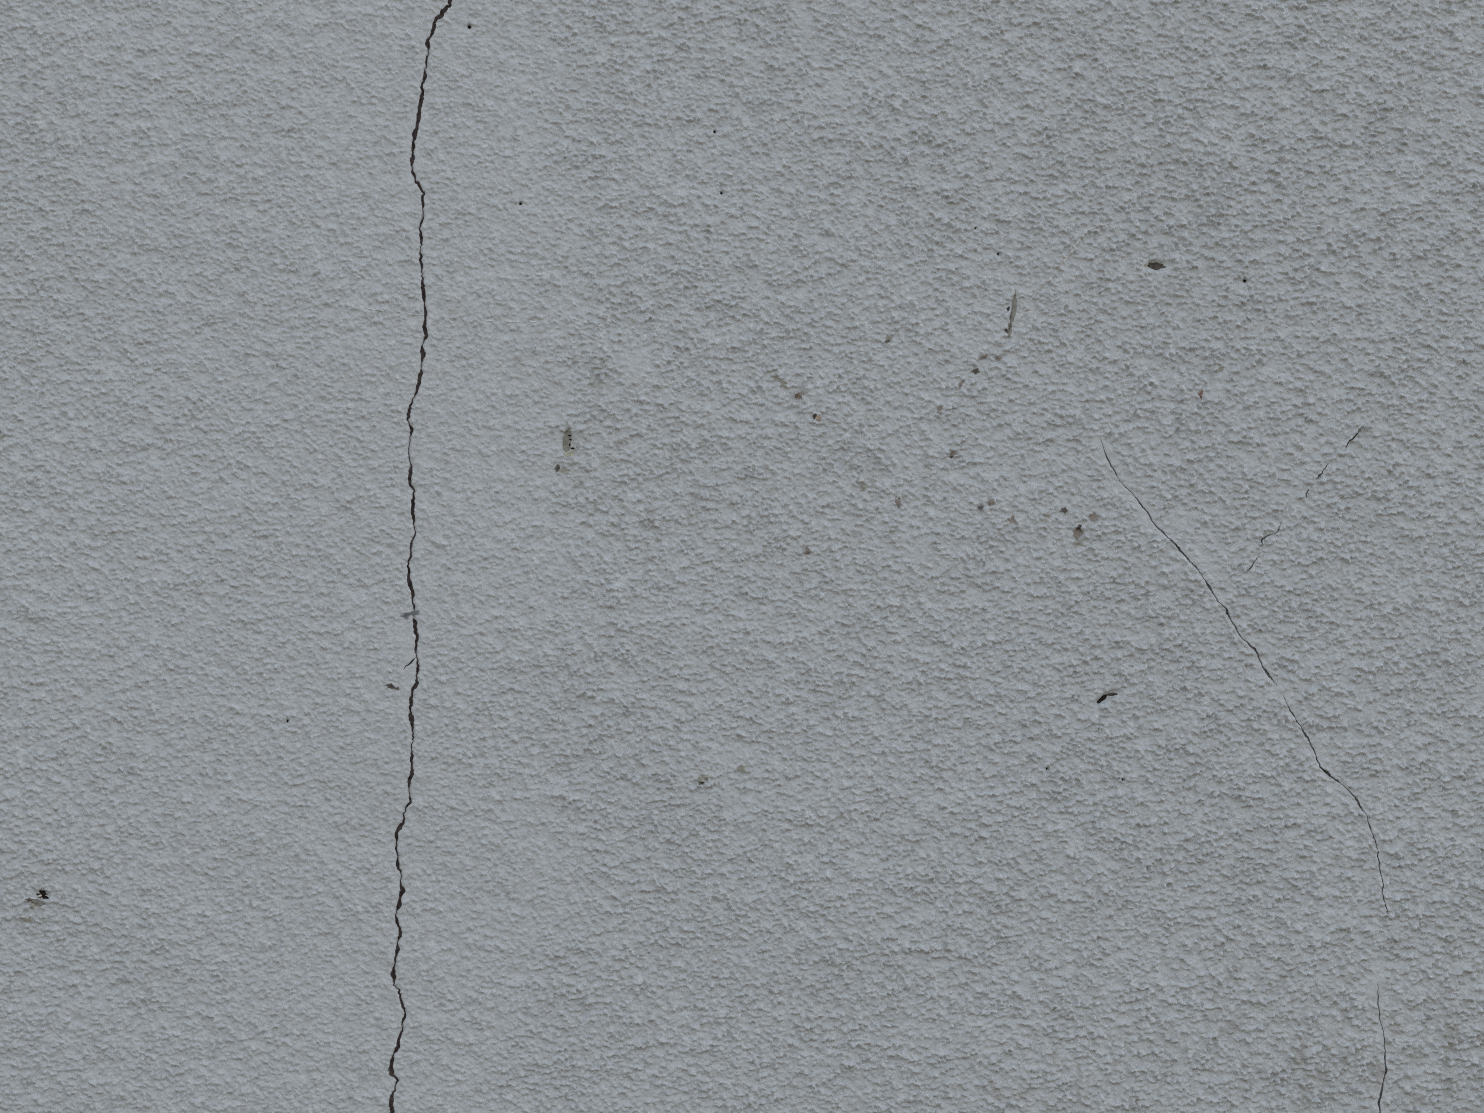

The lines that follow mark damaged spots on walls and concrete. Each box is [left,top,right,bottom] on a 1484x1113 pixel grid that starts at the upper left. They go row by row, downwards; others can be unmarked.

crack [388,0,452,1113]